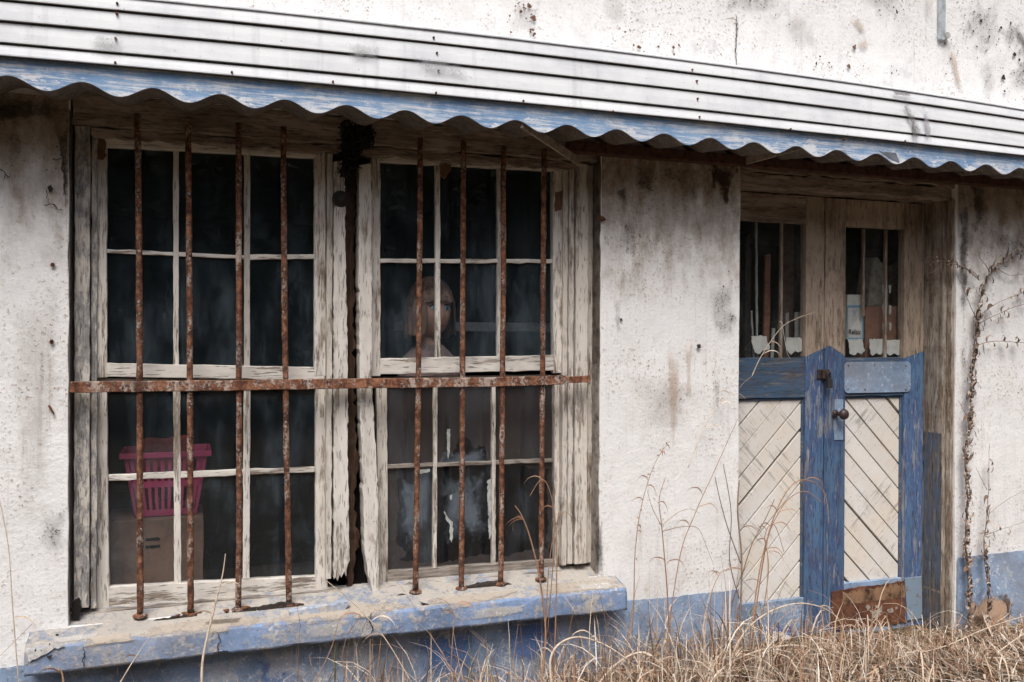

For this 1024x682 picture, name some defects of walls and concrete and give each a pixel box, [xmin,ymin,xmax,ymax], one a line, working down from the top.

leakage [964,1,1024,100]
peeling [26,633,131,662]
peeling [145,599,408,667]